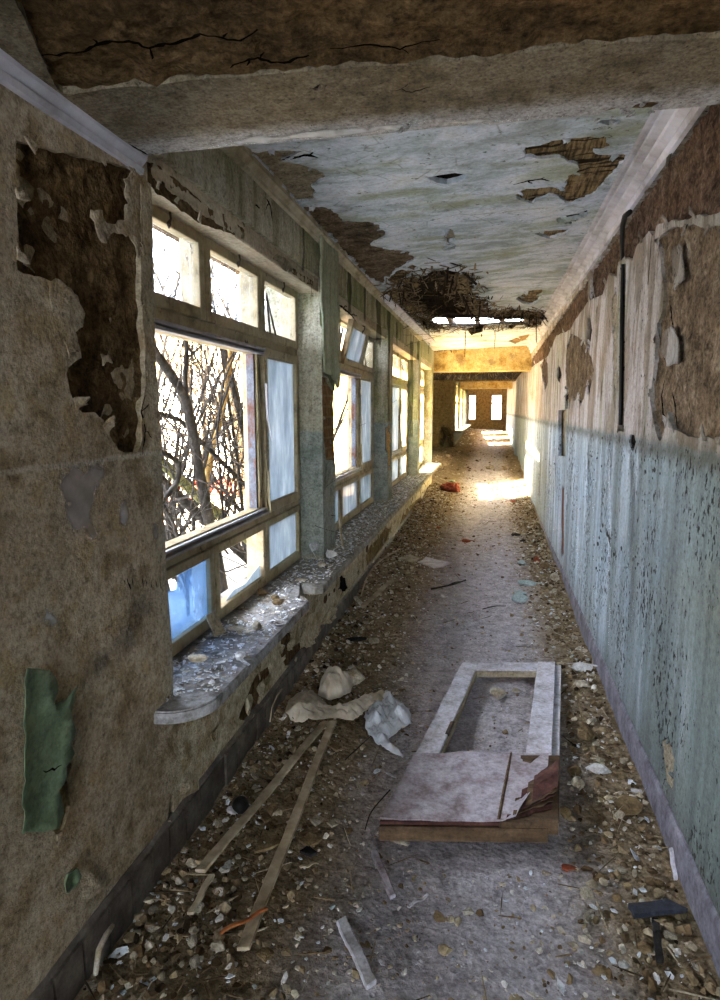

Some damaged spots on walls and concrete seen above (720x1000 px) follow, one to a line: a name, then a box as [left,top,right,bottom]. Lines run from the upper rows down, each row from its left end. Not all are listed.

crack [42,29,440,68]
spalling [15,136,245,452]
spalling [252,150,416,286]
spalling [516,102,720,445]
peeling [22,668,78,841]
peeling [64,868,82,893]